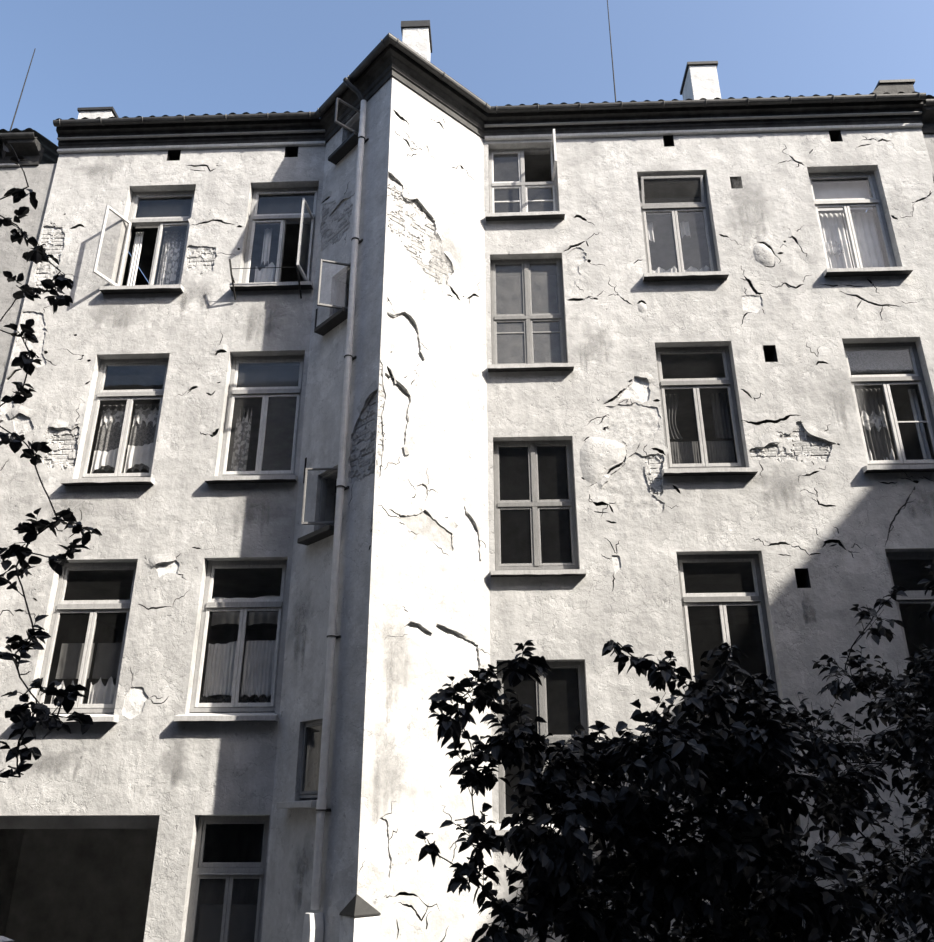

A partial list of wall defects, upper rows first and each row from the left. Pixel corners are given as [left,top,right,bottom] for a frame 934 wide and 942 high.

crack [778,148,813,167]
flaking render [34,212,89,290]
flaking render [386,166,463,301]
crack [558,211,599,263]
crack [719,228,917,320]
flaking render [0,395,80,470]
flaking render [348,296,429,505]
flaking render [585,372,685,524]
flaking render [741,407,840,478]
flaking render [377,472,486,562]
crack [752,462,933,558]
flaking render [386,607,490,680]